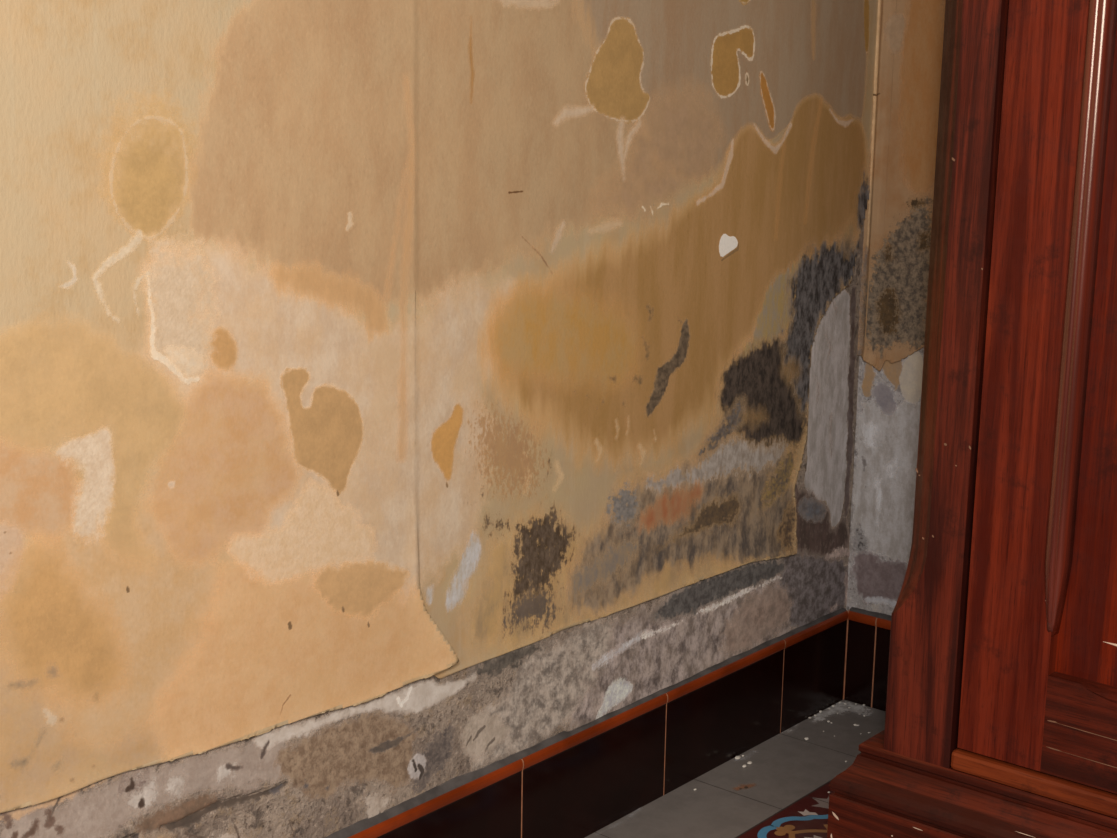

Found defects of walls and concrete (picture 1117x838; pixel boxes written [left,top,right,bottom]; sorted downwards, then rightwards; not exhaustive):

water stain [857,0,944,359]
peeling [719,234,739,261]
water stain [0,0,870,838]
peeling [804,289,920,566]
water stain [872,383,896,415]
water stain [850,528,907,606]
peeling [254,676,477,759]
peeling [461,712,509,759]
spalling [0,809,64,838]
peeling [125,770,185,808]
peeling [361,793,389,819]
peeling [407,754,426,780]